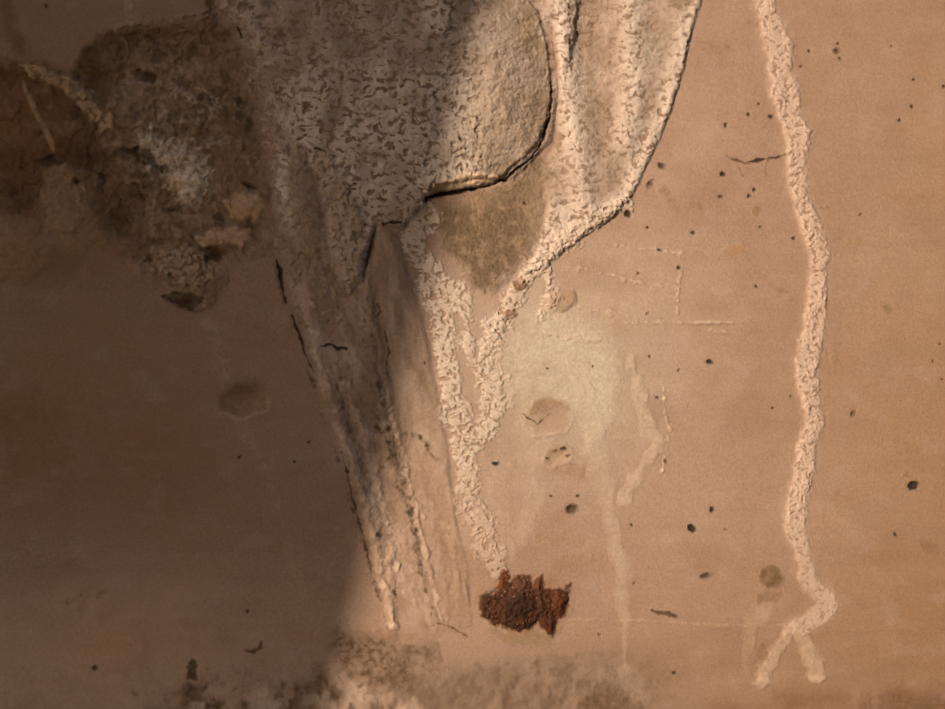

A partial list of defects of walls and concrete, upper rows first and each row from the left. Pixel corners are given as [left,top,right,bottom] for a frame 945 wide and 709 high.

crack [724,153,788,180]
spalling [0,22,473,640]
crack [275,258,348,372]
water stain [101,0,746,709]
water stain [738,0,864,690]
crack [340,450,374,586]
corrosion [469,566,581,654]